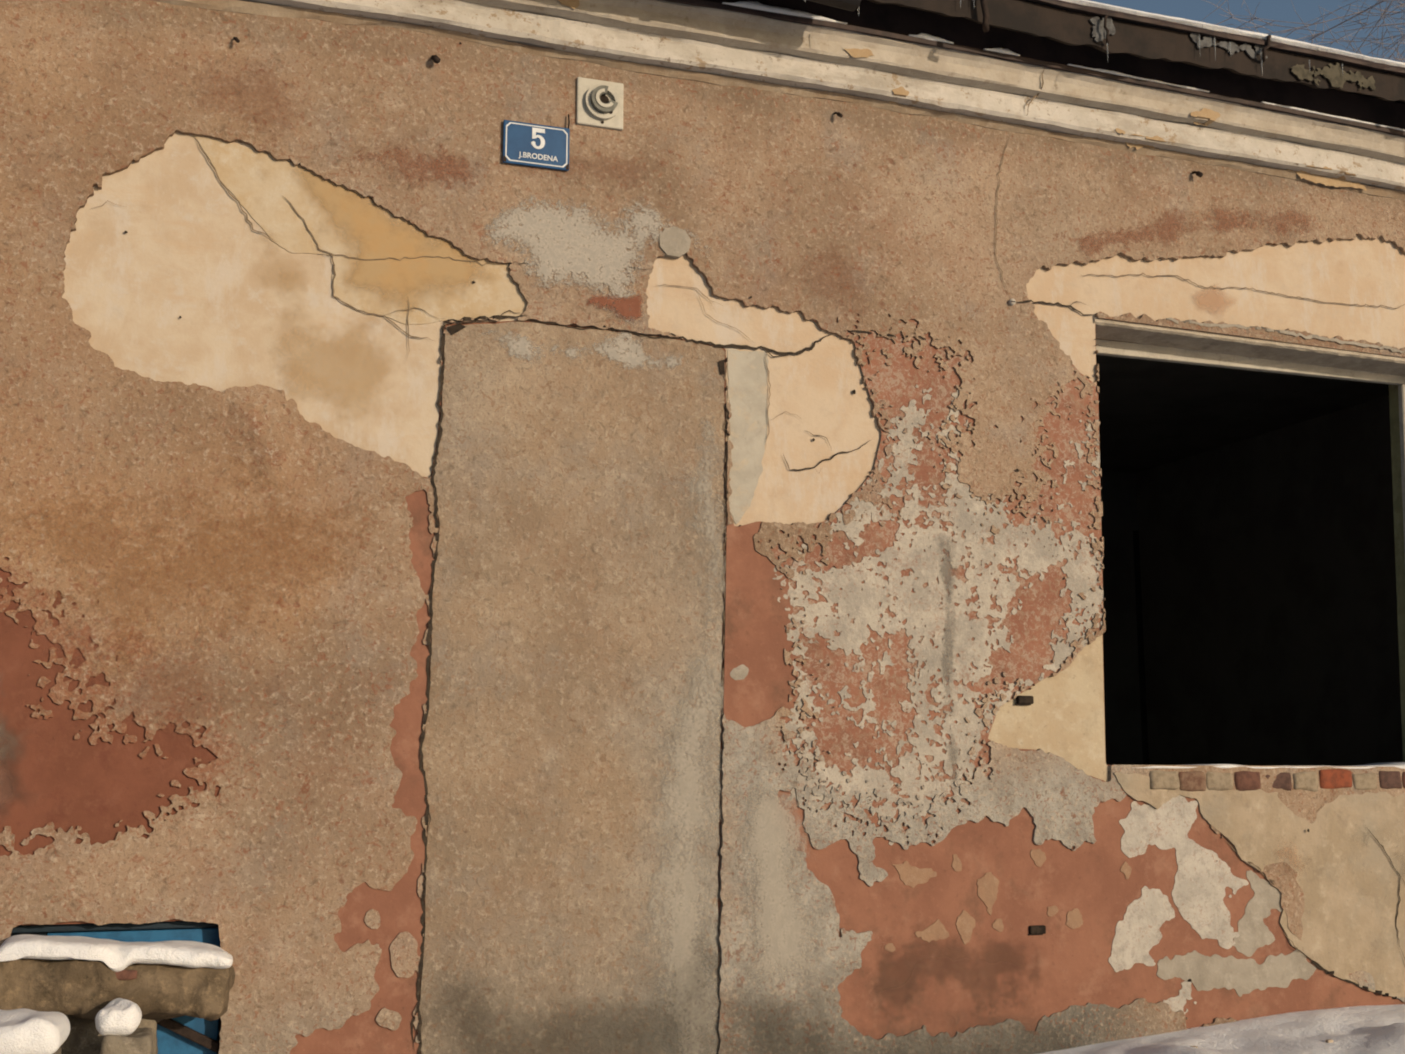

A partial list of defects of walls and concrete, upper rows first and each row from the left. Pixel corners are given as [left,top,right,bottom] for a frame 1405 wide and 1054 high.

peeling [558,0,579,9]
crack [196,139,274,241]
crack [995,68,1405,353]
flaking render [0,557,221,856]
flaking render [62,132,527,1054]
crack [283,196,937,1054]
flaking render [646,235,1405,1040]
crack [1226,841,1397,999]
crack [1365,824,1405,958]